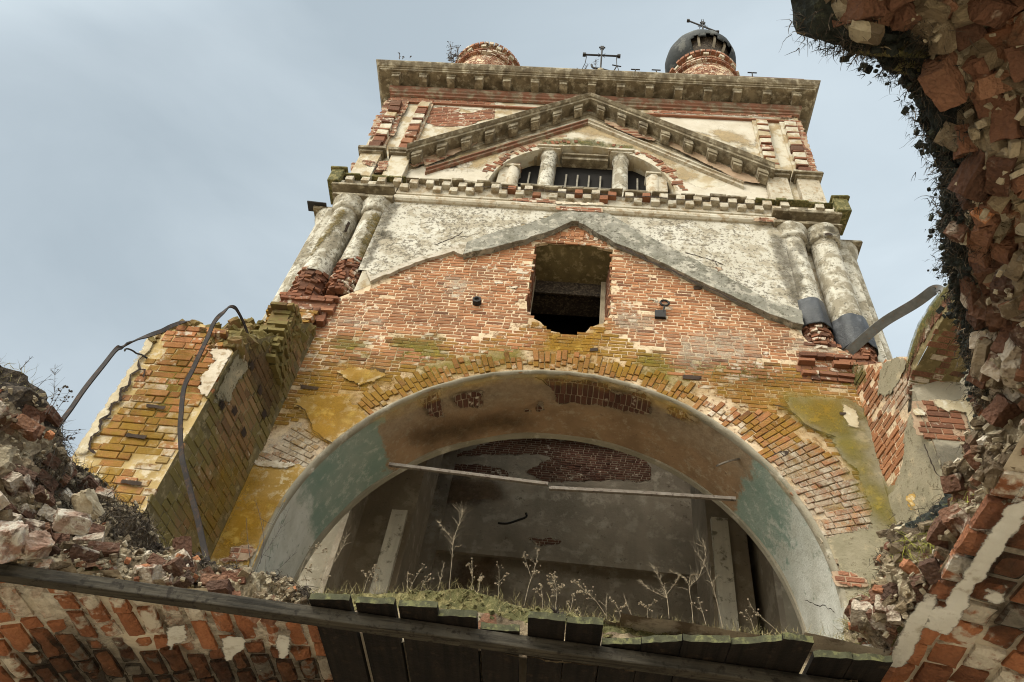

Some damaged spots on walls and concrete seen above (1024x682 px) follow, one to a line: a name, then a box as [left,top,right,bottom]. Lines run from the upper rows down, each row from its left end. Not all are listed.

spalling [368,96,495,136]
spalling [824,0,1024,652]
spalling [420,390,483,418]
spalling [524,378,652,414]
water stain [416,416,521,444]
spalling [454,438,651,483]
water stain [733,384,892,524]
spalling [0,386,311,606]
spalling [369,589,541,636]
spalling [600,619,669,646]